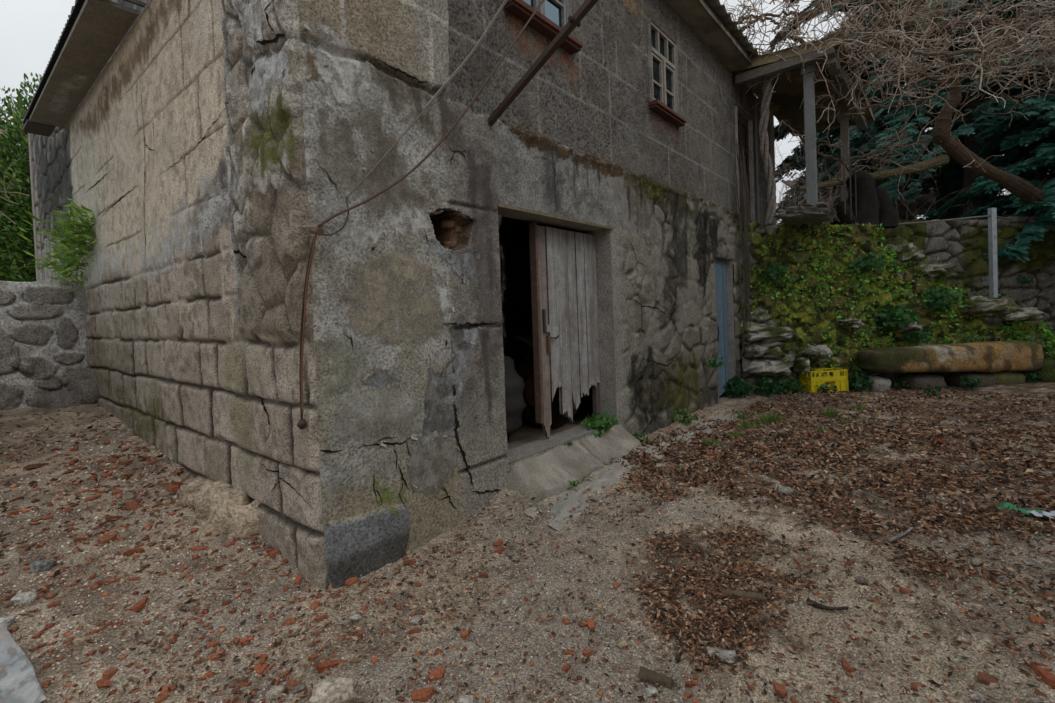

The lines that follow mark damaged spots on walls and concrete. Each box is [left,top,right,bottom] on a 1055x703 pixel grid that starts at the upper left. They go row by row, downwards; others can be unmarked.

spalling [334,204,477,259]
crack [319,436,417,506]
spalling [421,279,481,438]
crack [438,322,501,508]